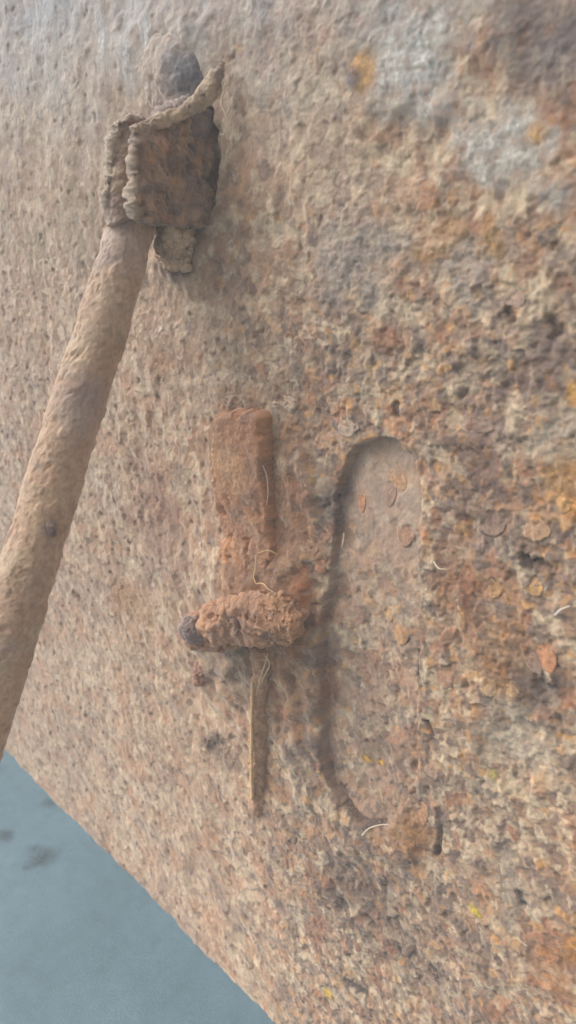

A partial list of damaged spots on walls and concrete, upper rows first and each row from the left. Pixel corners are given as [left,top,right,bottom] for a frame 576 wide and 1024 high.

rust [338,417,359,437]
rust [557,493,576,517]
rust [524,520,551,542]
rust [521,577,544,596]
rust [524,642,557,675]
rust [478,678,520,698]